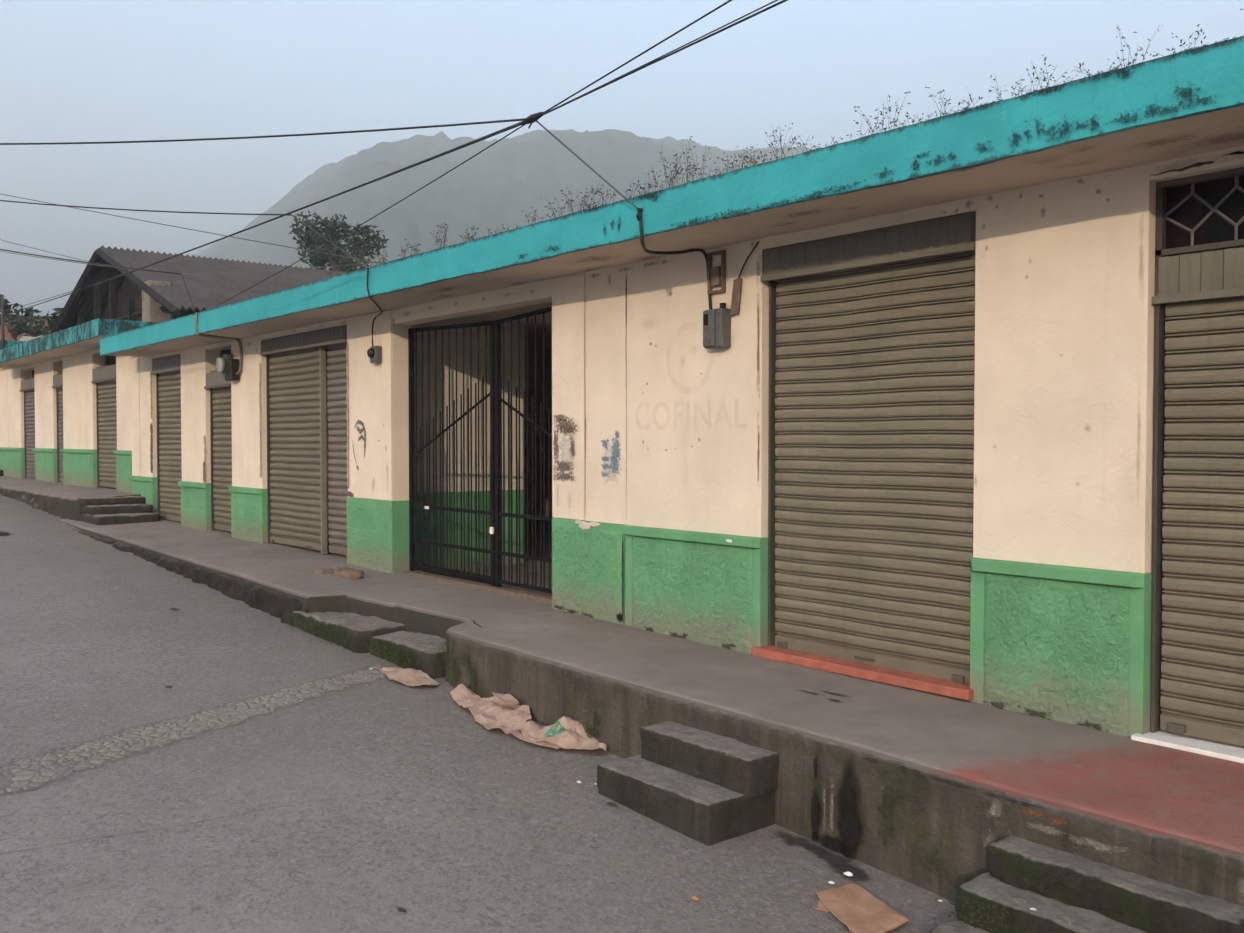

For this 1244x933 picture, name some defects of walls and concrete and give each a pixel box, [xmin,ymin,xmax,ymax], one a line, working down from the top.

water stain [1026,63,1142,95]
water stain [1158,37,1237,60]
mould [1010,84,1216,152]
water stain [777,758,870,880]